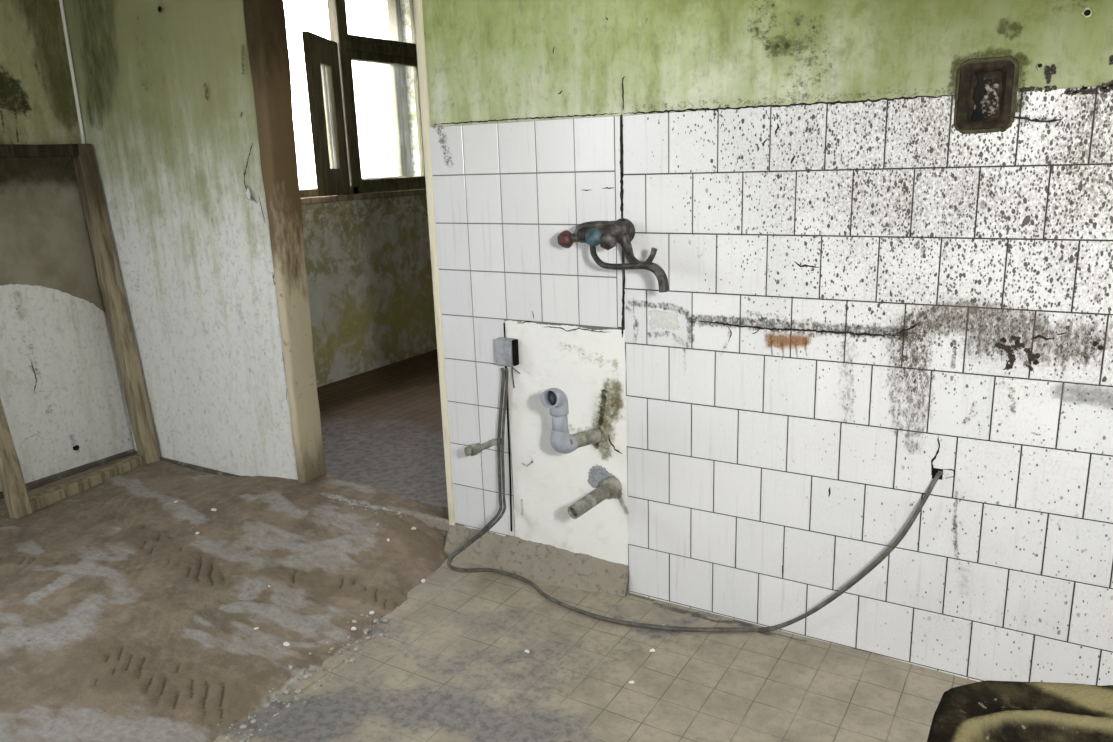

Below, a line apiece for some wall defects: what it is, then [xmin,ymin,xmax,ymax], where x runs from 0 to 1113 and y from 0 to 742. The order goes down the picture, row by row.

water stain [20,0,112,124]
water stain [0,65,32,142]
spalling [505,311,628,565]
water stain [598,389,606,425]
rust [766,334,810,356]
crack [691,315,919,339]
water stain [887,299,1113,452]